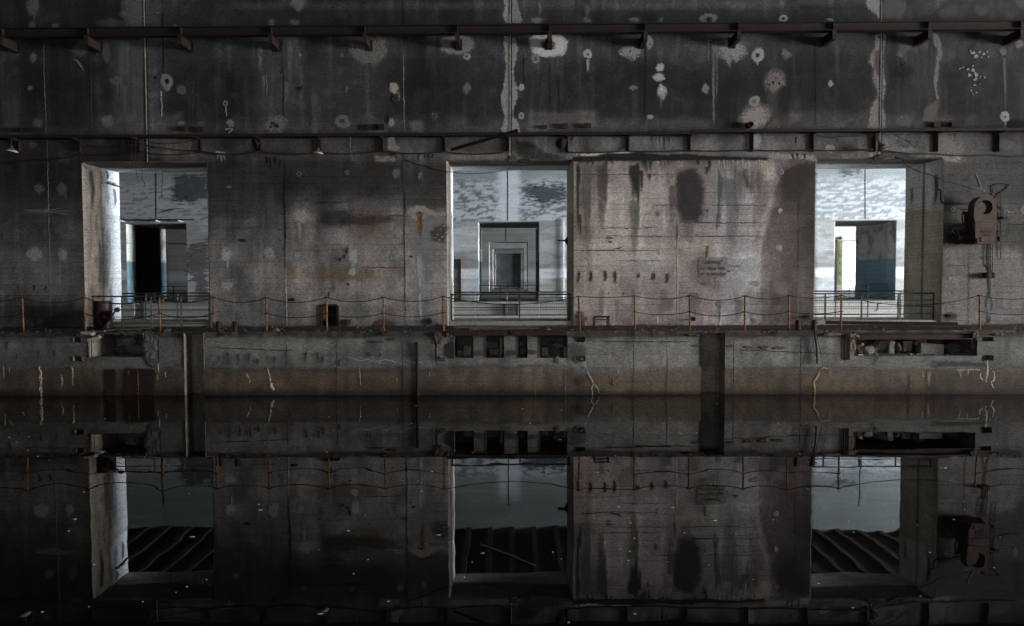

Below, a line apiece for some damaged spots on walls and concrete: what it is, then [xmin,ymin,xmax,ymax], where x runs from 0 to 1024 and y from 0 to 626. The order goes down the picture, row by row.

water stain [501,36,558,160]
water stain [867,33,886,128]
water stain [630,160,724,239]